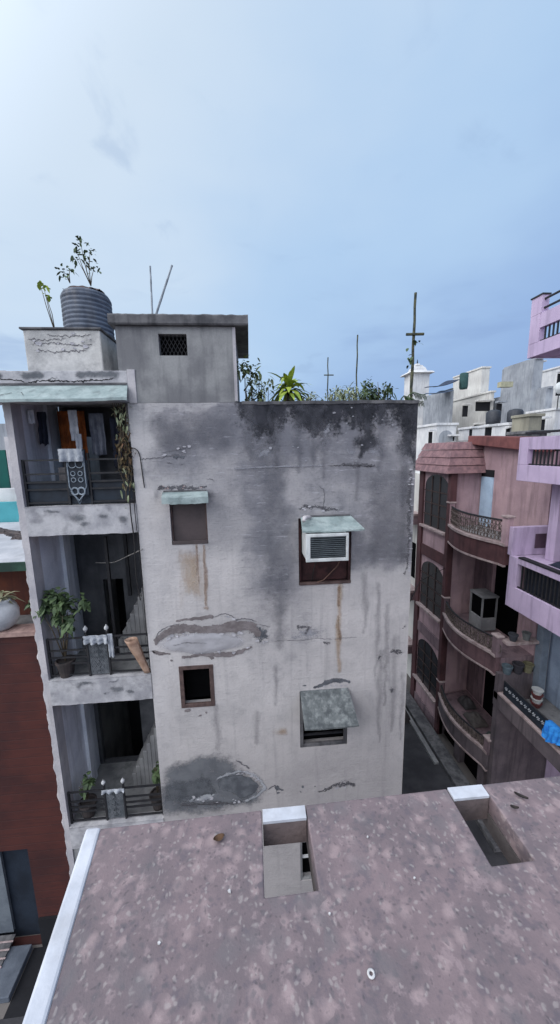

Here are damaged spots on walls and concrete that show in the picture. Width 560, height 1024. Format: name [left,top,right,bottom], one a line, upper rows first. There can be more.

crack [0,332,113,383]
water stain [235,401,418,467]
peeling [152,613,268,661]